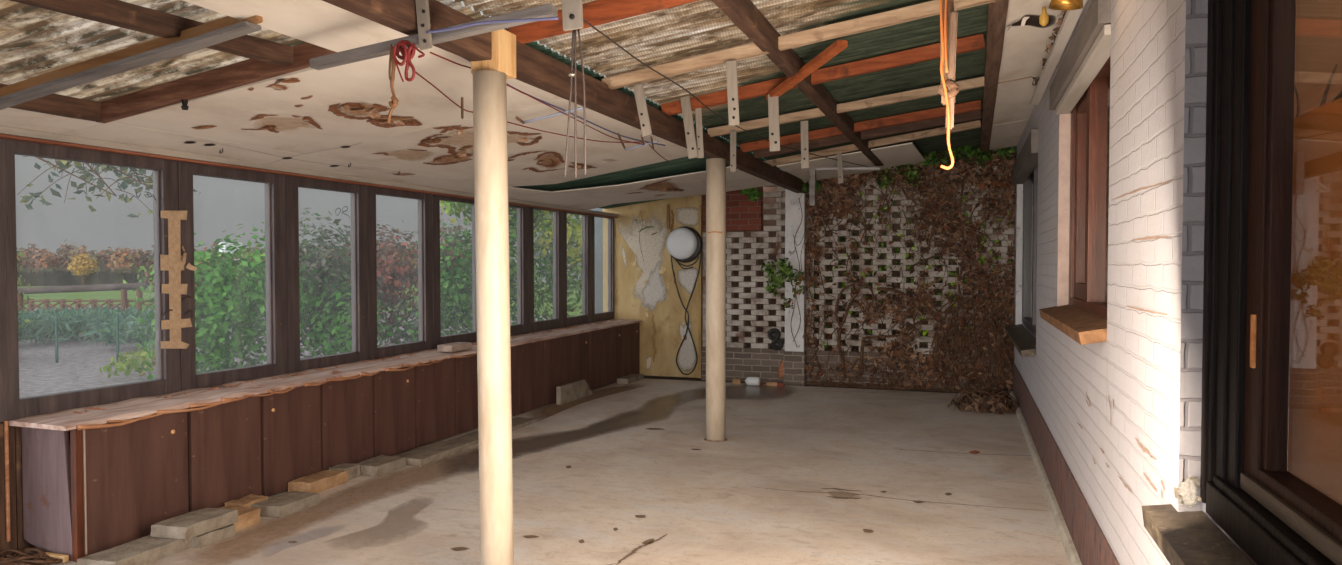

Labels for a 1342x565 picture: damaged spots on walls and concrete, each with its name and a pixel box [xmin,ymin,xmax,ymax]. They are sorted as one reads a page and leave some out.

peeling [619,208,699,317]
water stain [726,384,792,399]
water stain [512,386,706,458]
water stain [447,448,479,471]
water stain [350,502,425,542]
crack [610,534,667,565]